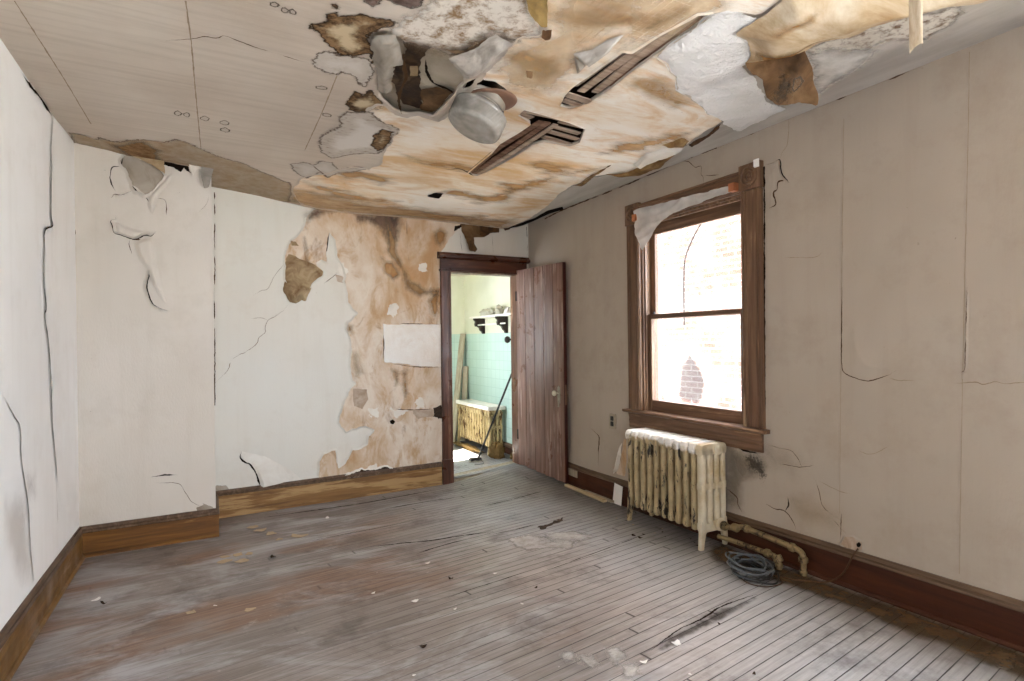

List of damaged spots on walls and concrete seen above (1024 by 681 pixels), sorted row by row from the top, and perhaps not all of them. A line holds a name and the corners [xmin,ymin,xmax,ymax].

crack [24,77,58,486]
flaking render [109,154,191,215]
crack [214,192,288,405]
flaking render [283,0,785,477]
crack [763,131,818,409]
crack [3,393,35,583]
leakage [731,455,765,500]
crack [741,446,845,537]